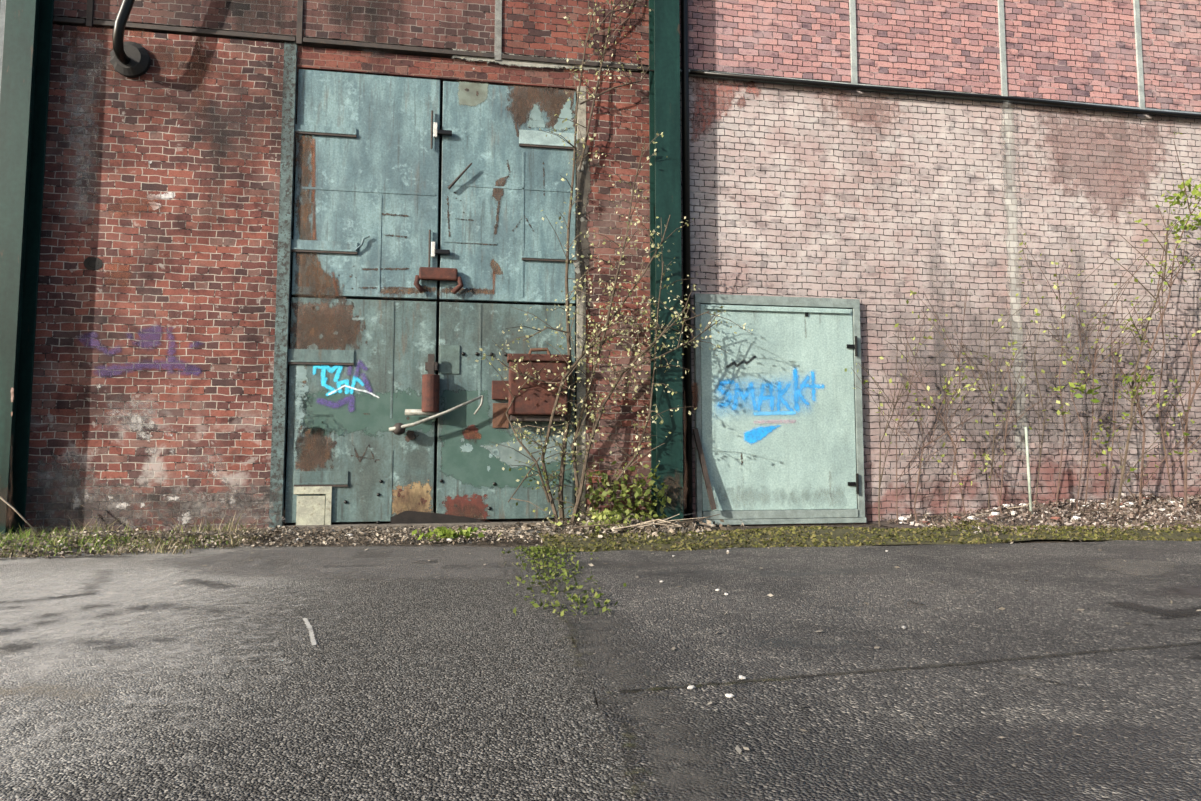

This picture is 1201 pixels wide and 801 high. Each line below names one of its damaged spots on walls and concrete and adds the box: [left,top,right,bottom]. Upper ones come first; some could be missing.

peeling [458,50,489,107]
rust [293,134,344,299]
peeling [446,160,510,294]
peeling [506,73,591,316]
rust [390,480,490,524]